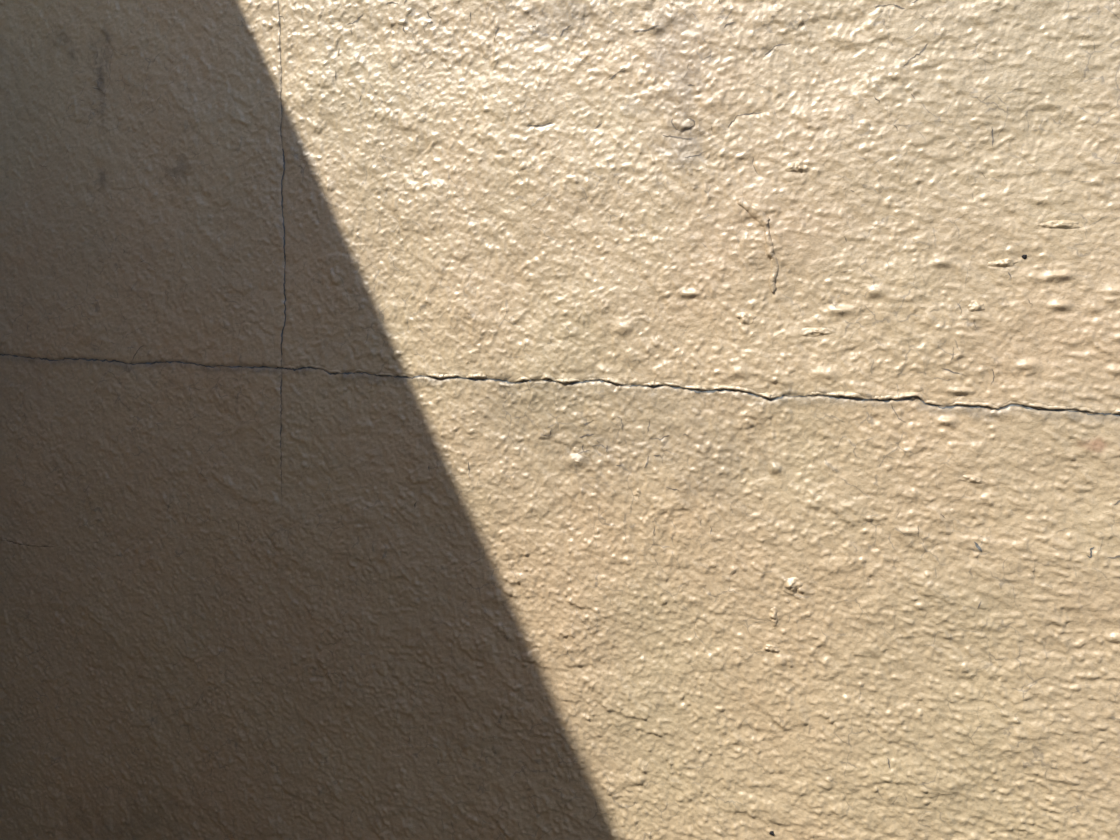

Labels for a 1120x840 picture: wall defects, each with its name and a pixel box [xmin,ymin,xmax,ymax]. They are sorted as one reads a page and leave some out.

crack [0,3,1120,509]